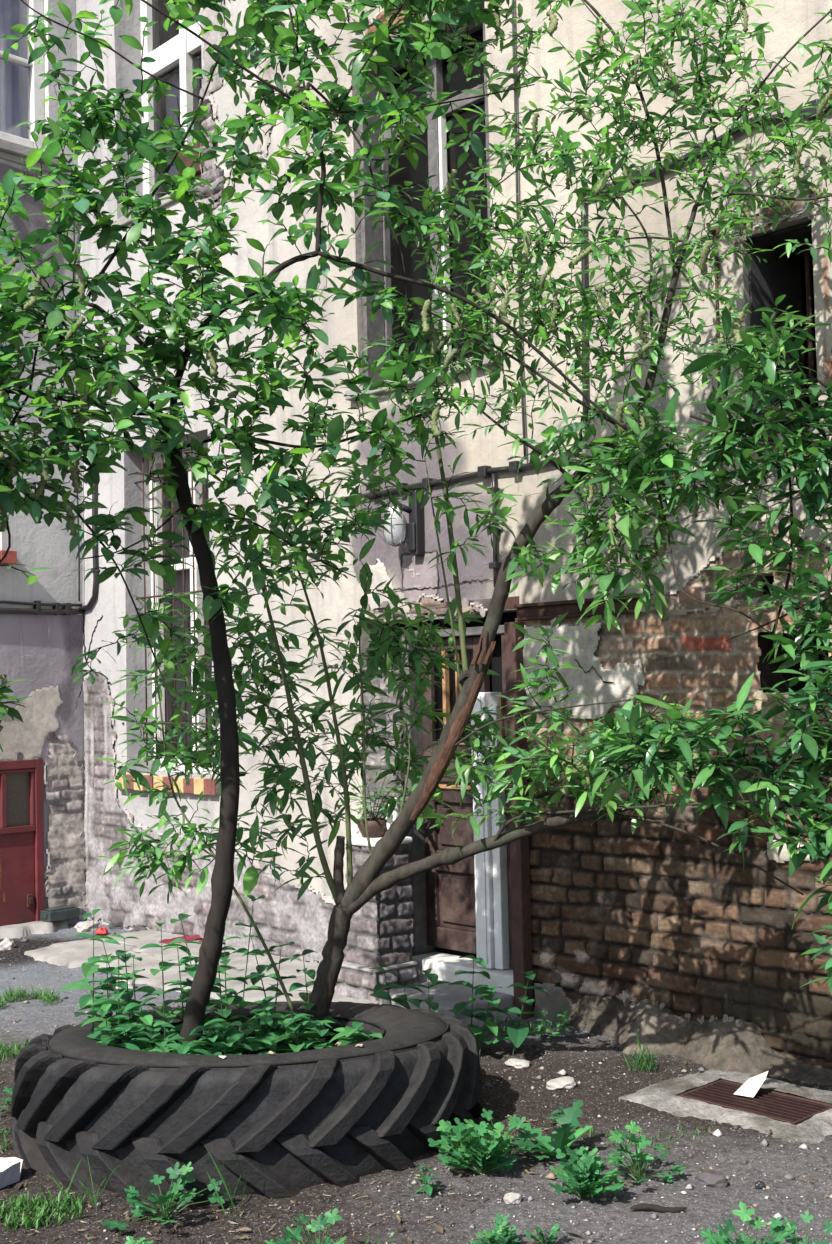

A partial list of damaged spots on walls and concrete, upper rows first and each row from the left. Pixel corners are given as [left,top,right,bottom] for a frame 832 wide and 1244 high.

peeling [523,617,646,721]
spalling [0,671,216,938]
spalling [223,852,336,964]